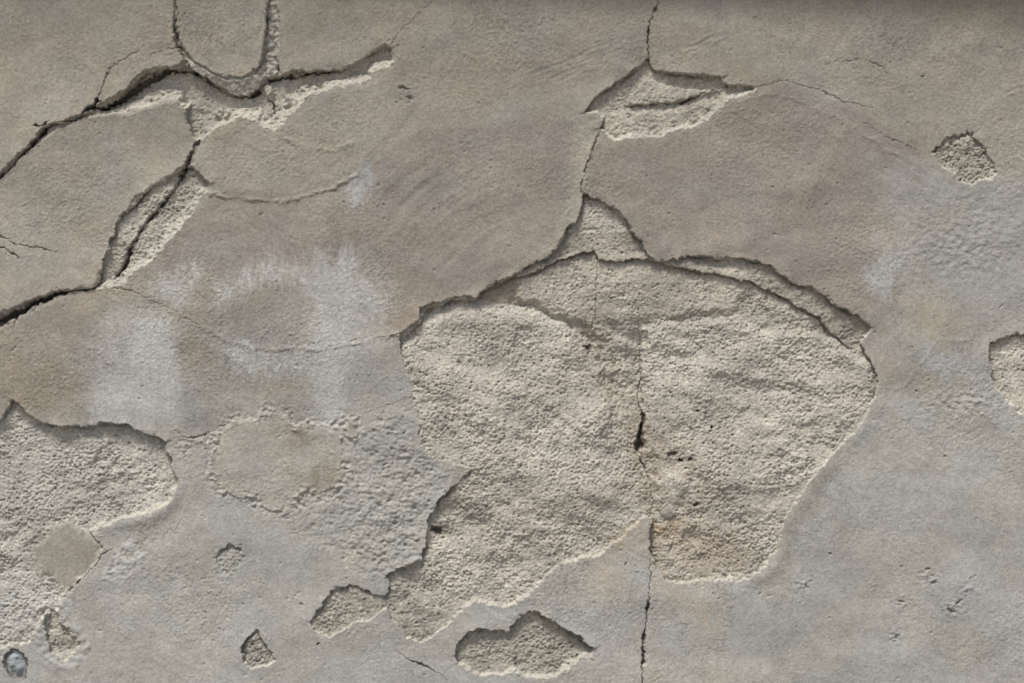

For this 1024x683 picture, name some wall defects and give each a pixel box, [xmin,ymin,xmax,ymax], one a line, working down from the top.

crack [0,141,215,332]
spalling [95,166,210,291]
crack [0,0,337,179]
spalling [99,0,395,141]
crack [580,128,602,195]
spalling [585,59,757,141]
spalling [931,130,998,187]
spalling [0,400,179,592]
spalling [205,194,879,679]
crack [633,333,654,510]
spalling [0,614,81,680]
crack [641,569,652,683]